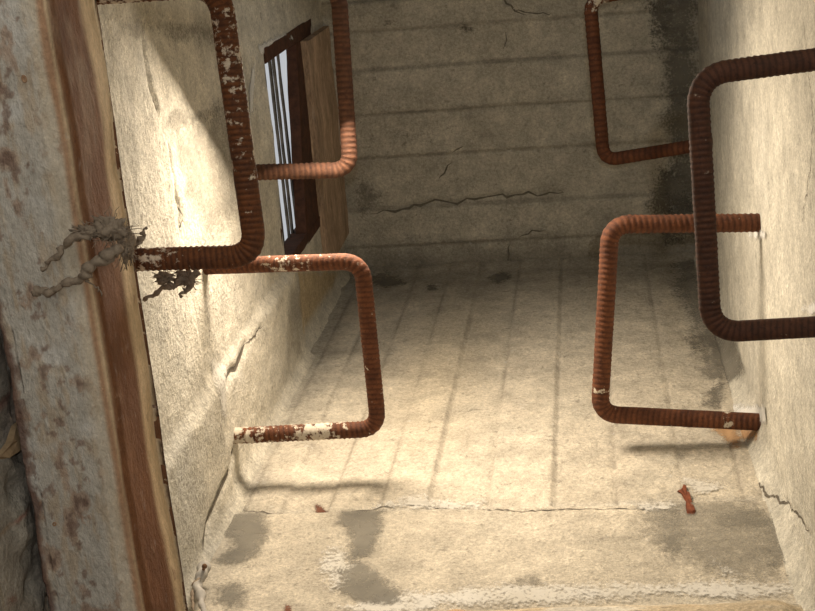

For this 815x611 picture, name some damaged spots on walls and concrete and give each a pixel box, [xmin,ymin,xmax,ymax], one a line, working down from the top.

crack [504,0,550,15]
damp [648,0,699,143]
crack [374,191,564,214]
damp [645,153,693,215]
crack [225,327,262,380]
corrosion [677,484,696,515]
crack [759,482,811,536]
damp [217,511,269,564]
damp [215,582,246,610]